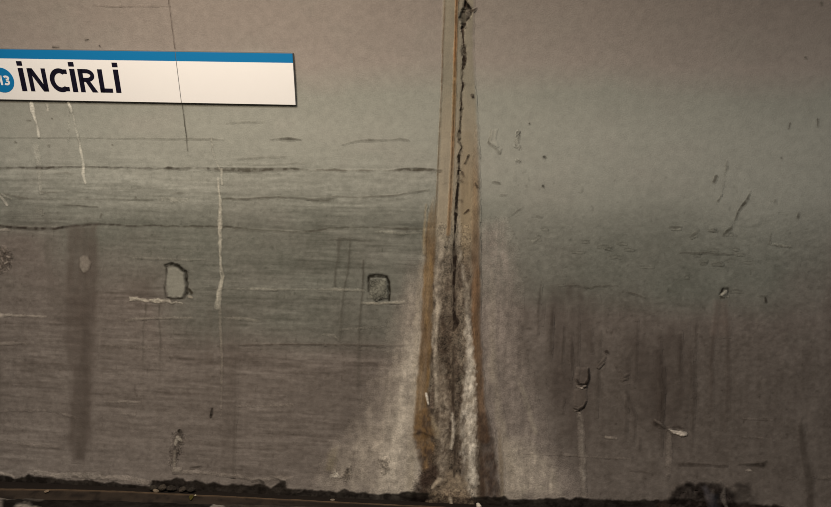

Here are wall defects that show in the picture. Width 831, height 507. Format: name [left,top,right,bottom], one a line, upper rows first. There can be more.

spalling [128,262,194,305]
crack [0,0,468,479]
leakage [0,137,733,507]
spalling [361,273,407,306]
rust [410,0,459,471]
spalling [652,419,762,507]
leakage [756,416,816,507]